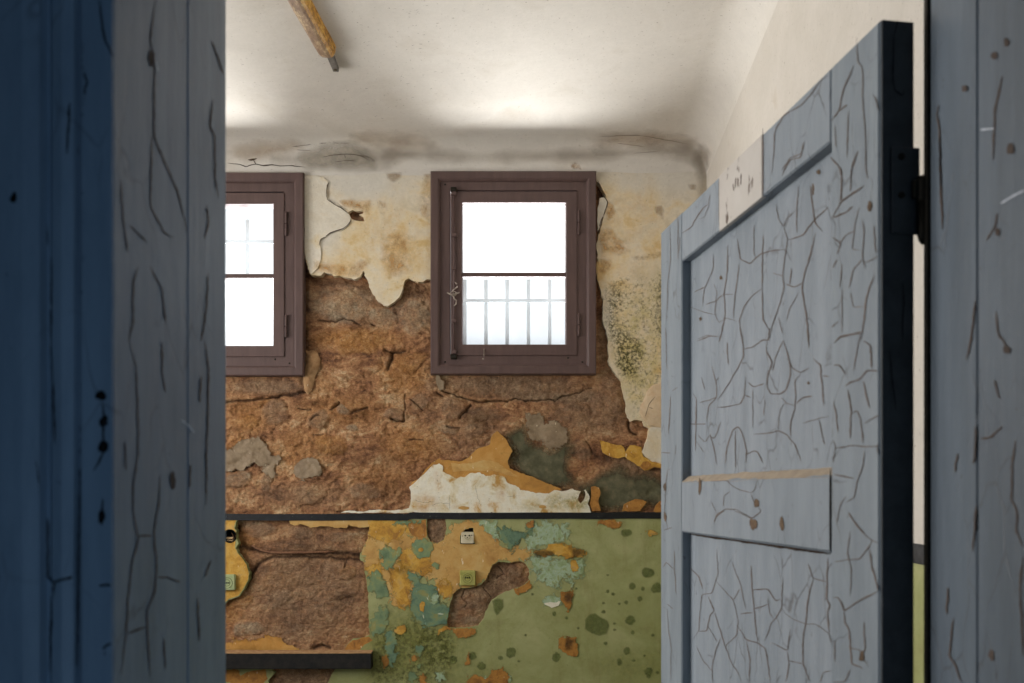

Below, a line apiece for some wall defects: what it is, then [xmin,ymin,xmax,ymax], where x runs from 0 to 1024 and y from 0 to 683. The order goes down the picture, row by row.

crack [46,0,301,675]
flaking render [226,176,667,650]
leakage [609,290,661,374]
flaking render [226,669,335,683]